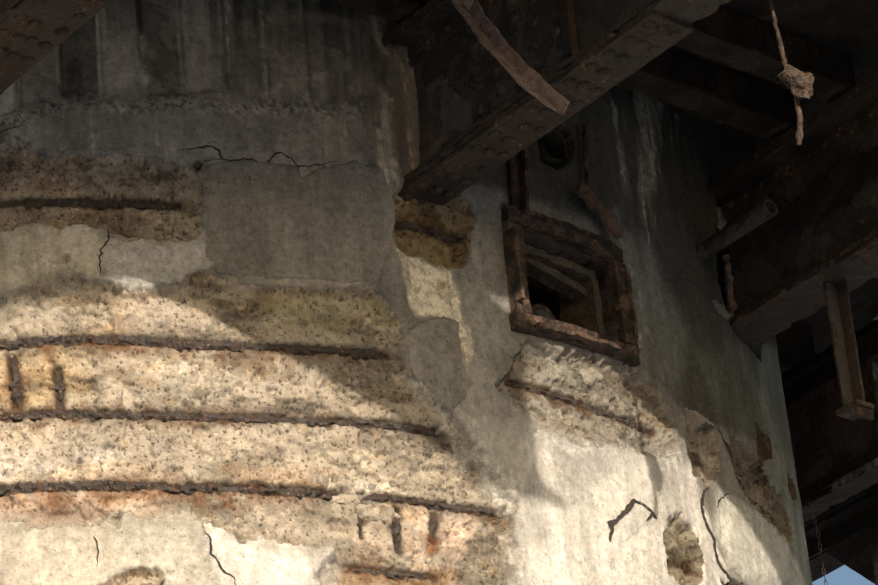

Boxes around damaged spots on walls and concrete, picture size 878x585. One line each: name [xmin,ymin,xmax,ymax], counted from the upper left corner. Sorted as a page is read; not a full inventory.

spalling [0,137,204,247]
crack [181,145,334,173]
damp [376,89,399,192]
spalling [392,189,475,270]
rust [723,254,737,317]
spalling [0,266,519,585]
spalling [495,343,674,461]
spalling [685,407,720,485]
crack [189,512,236,585]
crack [607,499,657,542]
spalling [663,515,705,585]
crack [700,428,776,585]